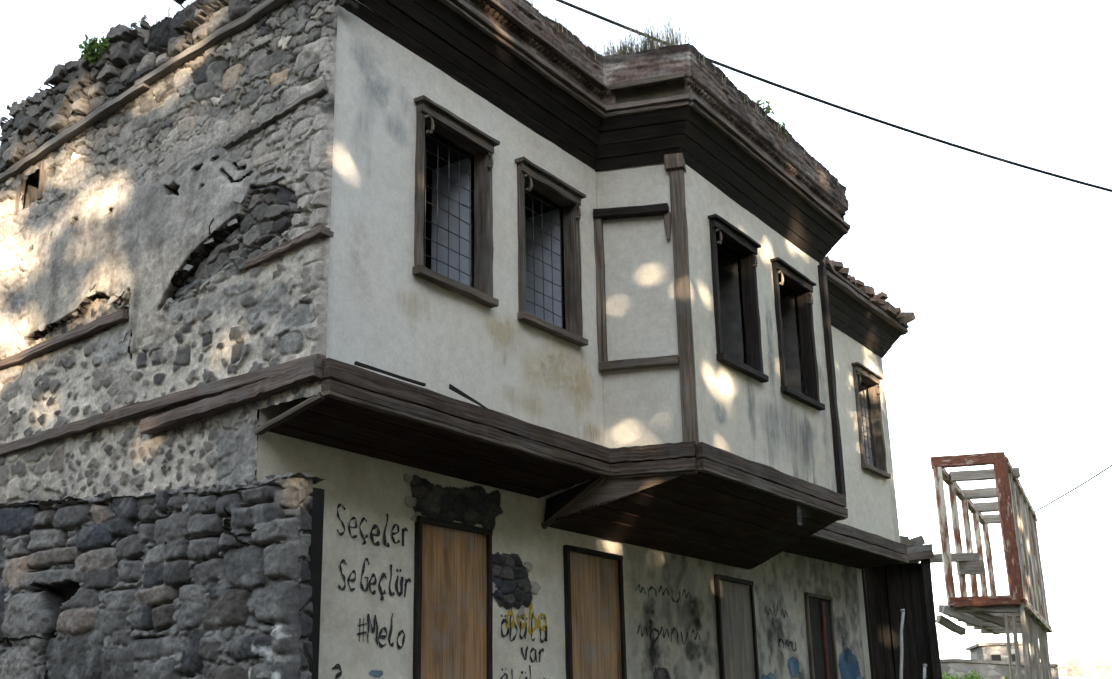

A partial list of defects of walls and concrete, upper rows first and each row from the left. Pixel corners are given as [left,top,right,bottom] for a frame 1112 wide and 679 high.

flaking render [165,174,301,305]
flaking render [29,290,130,347]
flaking render [403,473,503,530]
flaking render [492,552,541,616]